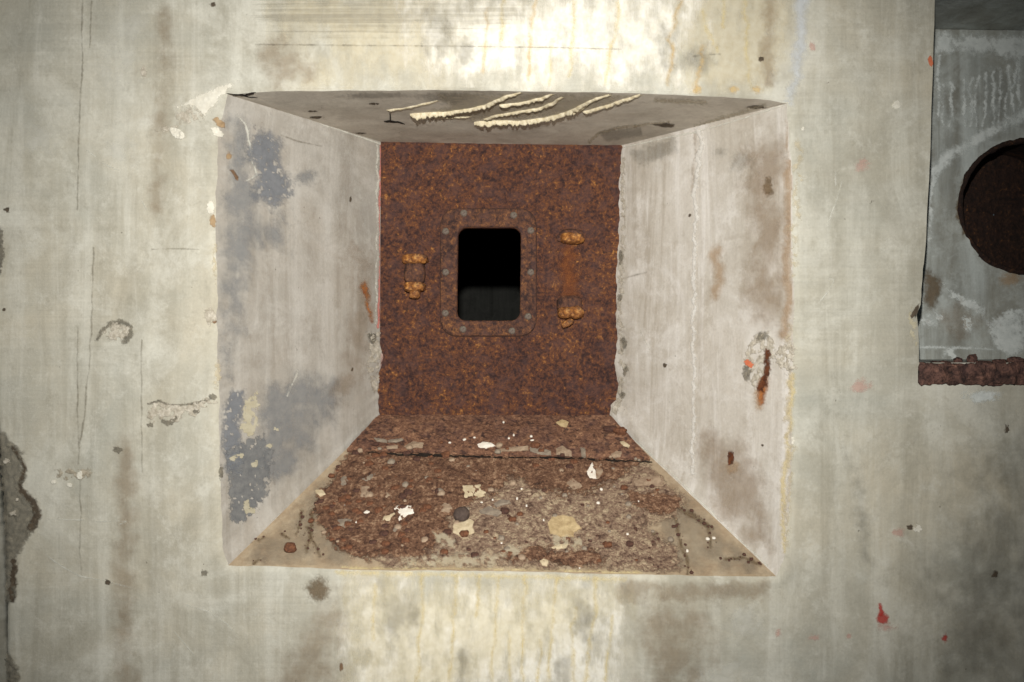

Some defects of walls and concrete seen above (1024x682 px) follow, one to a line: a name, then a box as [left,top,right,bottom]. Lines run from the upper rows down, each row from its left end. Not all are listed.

peeling [207,201,216,227]
damp [226,133,313,290]
spalling [96,319,132,343]
corrosion [938,354,1024,364]
peeling [147,382,334,523]
crack [368,451,651,463]
spalling [0,432,41,602]